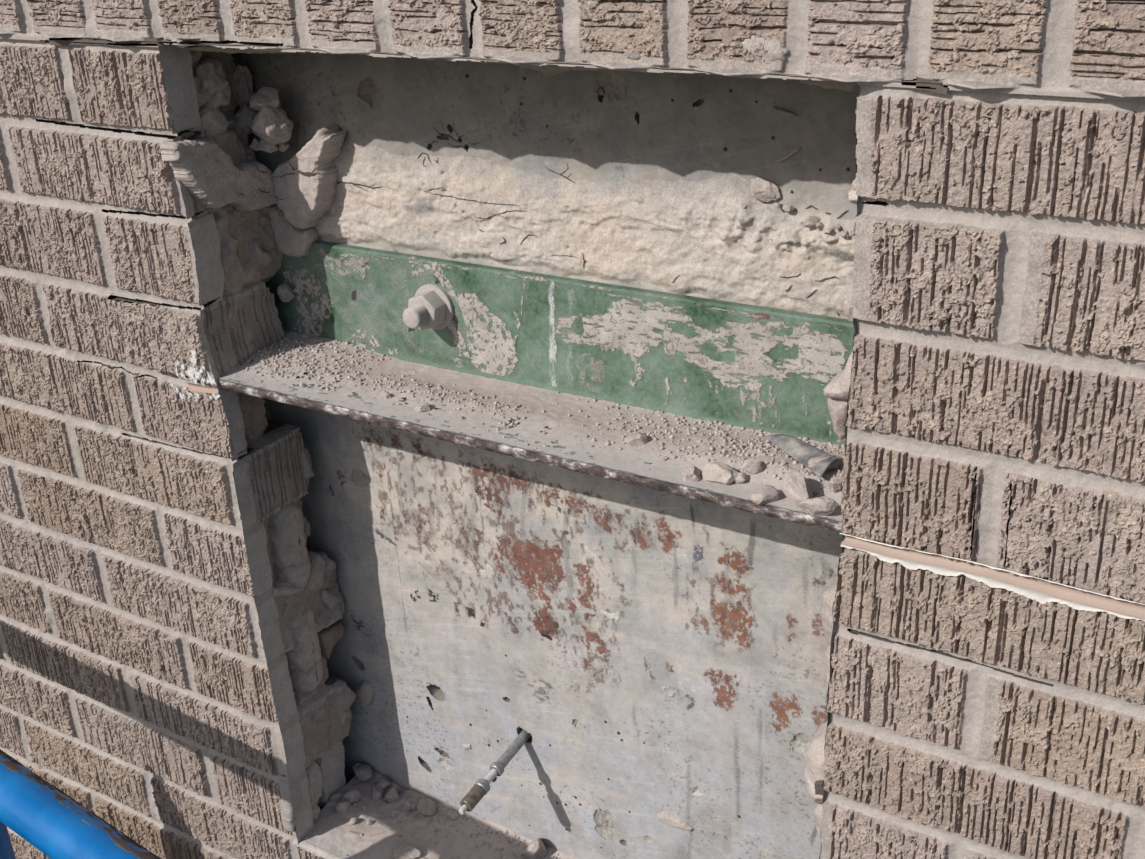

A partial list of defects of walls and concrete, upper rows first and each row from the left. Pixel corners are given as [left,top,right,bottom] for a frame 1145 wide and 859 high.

crack [469,0,478,46]
crack [45,120,201,140]
spalling [160,124,346,257]
corrosion [367,423,681,691]
corrosion [685,544,757,648]
crack [849,629,1053,687]
corrosion [704,670,739,710]
corrosion [770,693,828,731]